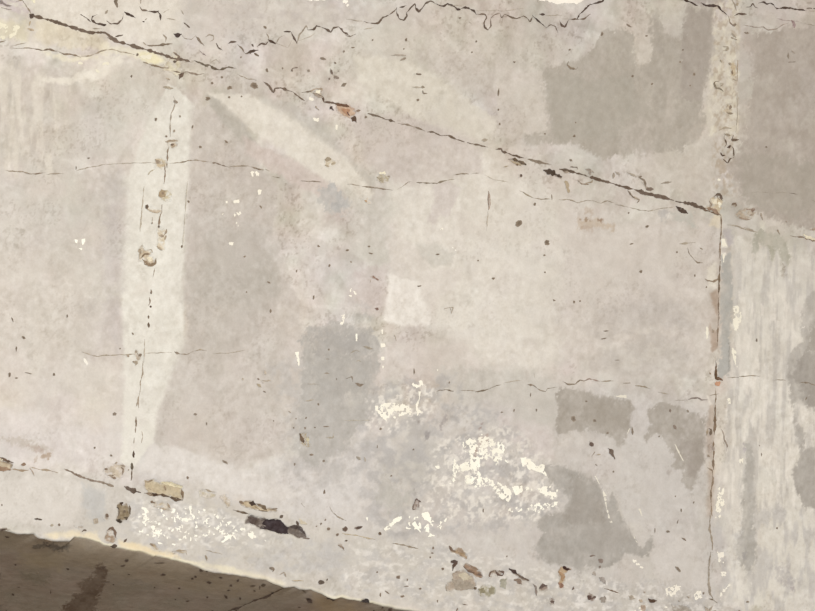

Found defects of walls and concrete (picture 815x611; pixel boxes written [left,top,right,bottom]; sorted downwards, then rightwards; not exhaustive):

crack [0,0,604,75]
crack [684,0,815,34]
damp [520,0,727,165]
crack [7,159,279,178]
crack [347,173,672,226]
peeling [442,434,558,513]
damp [551,384,710,493]
spalling [93,476,368,555]
peeling [378,498,447,558]
damp [530,463,657,586]
damp [58,561,111,611]
spalling [441,544,574,605]